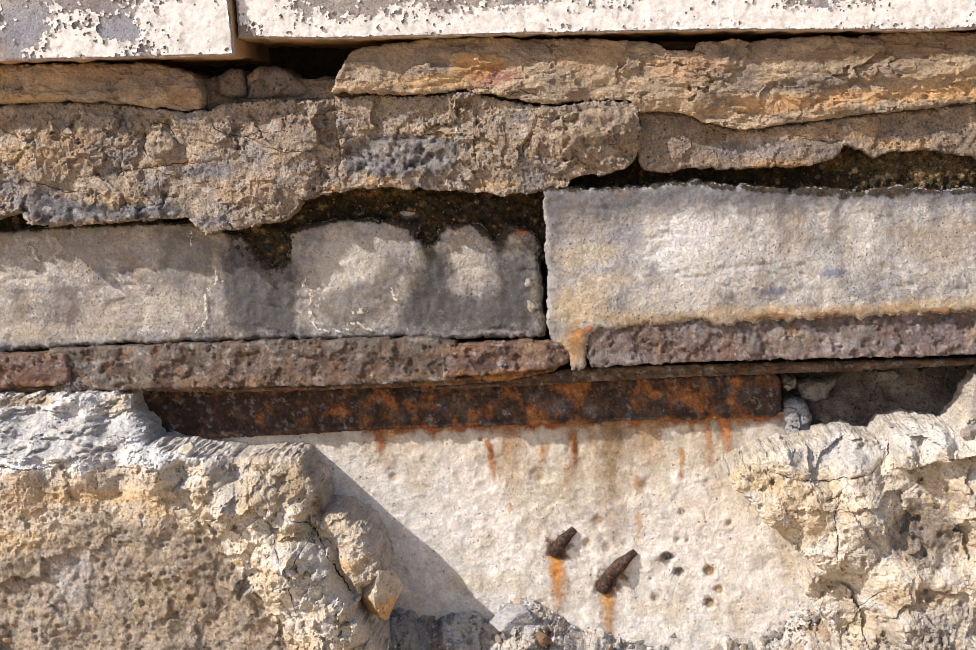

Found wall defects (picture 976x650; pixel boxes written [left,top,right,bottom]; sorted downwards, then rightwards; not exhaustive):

peeling [21,0,976,59]
water stain [162,230,533,337]
rust [85,367,557,393]
rust [374,414,783,476]
crack [772,443,889,560]
spalling [720,363,976,650]
crack [274,521,354,630]
rust [548,554,567,598]
rust [596,582,615,632]